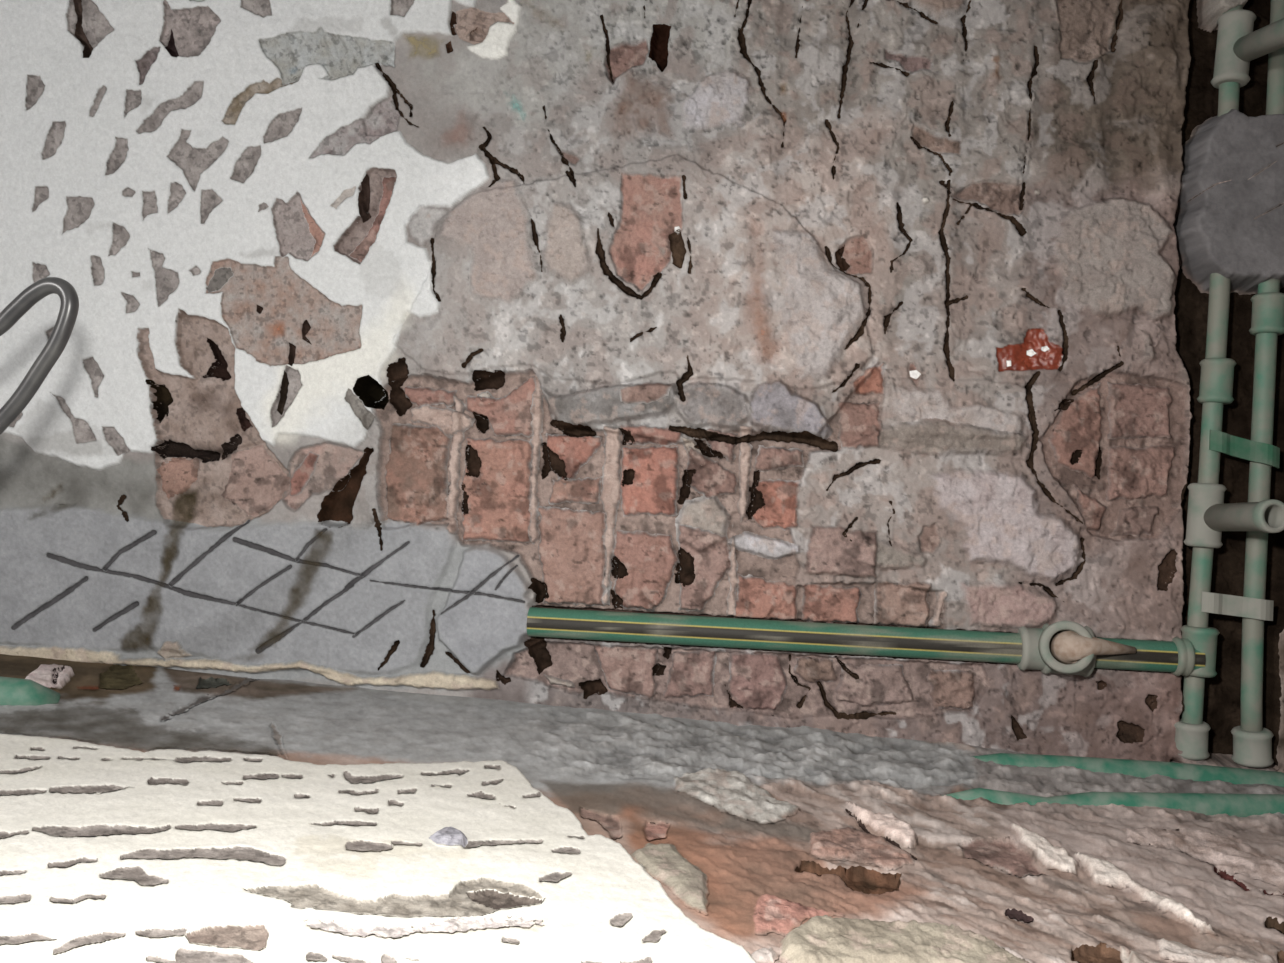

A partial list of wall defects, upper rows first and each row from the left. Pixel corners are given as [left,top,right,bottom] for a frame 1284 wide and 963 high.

peeling [65,0,114,58]
peeling [104,0,221,175]
peeling [122,26,400,224]
crack [479,127,542,272]
crack [595,212,693,342]
crack [825,46,1039,393]
spalling [120,167,947,629]
crack [669,355,881,491]
crack [1018,288,1124,602]
spalling [1039,370,1190,591]
crack [378,610,471,674]
spalling [496,637,990,720]